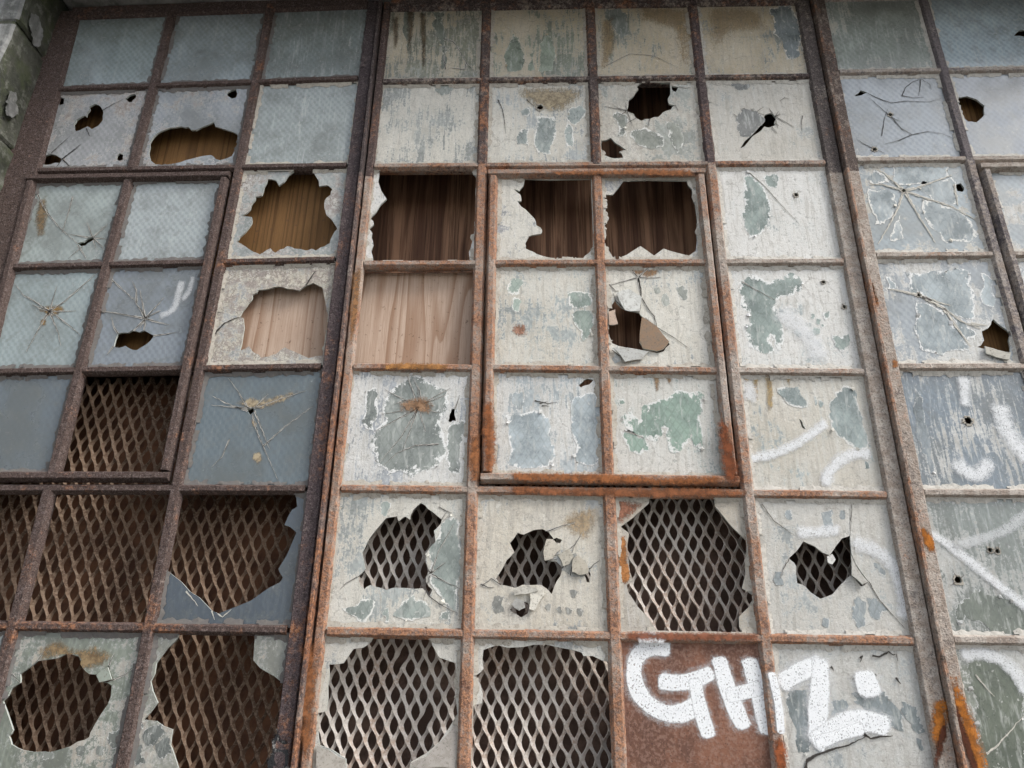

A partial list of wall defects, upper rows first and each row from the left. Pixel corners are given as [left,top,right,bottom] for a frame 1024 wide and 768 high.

peeling [742,170,780,238]
crack [857,79,974,244]
crack [15,194,175,354]
peeling [739,273,850,354]
crack [890,289,987,347]
crack [213,378,313,479]
peeling [362,373,465,478]
corrosion [470,402,496,481]
corrosion [513,420,747,521]
peeling [619,390,707,455]
corrosion [300,647,316,757]
corrosion [931,677,988,768]